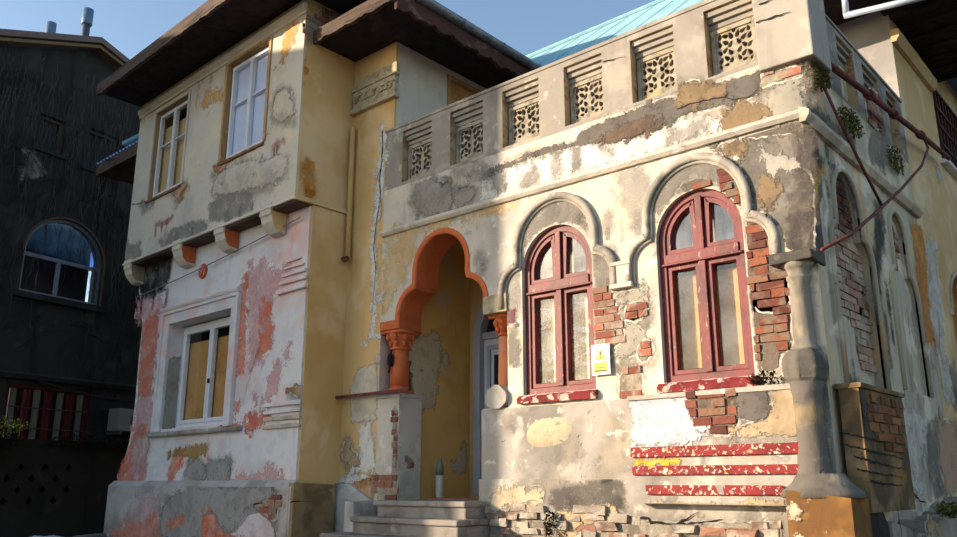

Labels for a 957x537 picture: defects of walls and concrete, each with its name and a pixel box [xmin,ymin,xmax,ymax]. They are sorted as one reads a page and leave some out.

spalling [279,8,340,64]
crack [756,0,789,23]
crack [371,130,383,320]
peeling [479,64,827,374]
peeling [117,294,181,481]
spalling [109,443,285,537]
peeling [219,257,301,438]
peeling [338,353,414,500]
spalling [484,481,804,537]
crack [640,512,723,525]
peeling [592,278,797,466]
spalling [865,224,957,499]